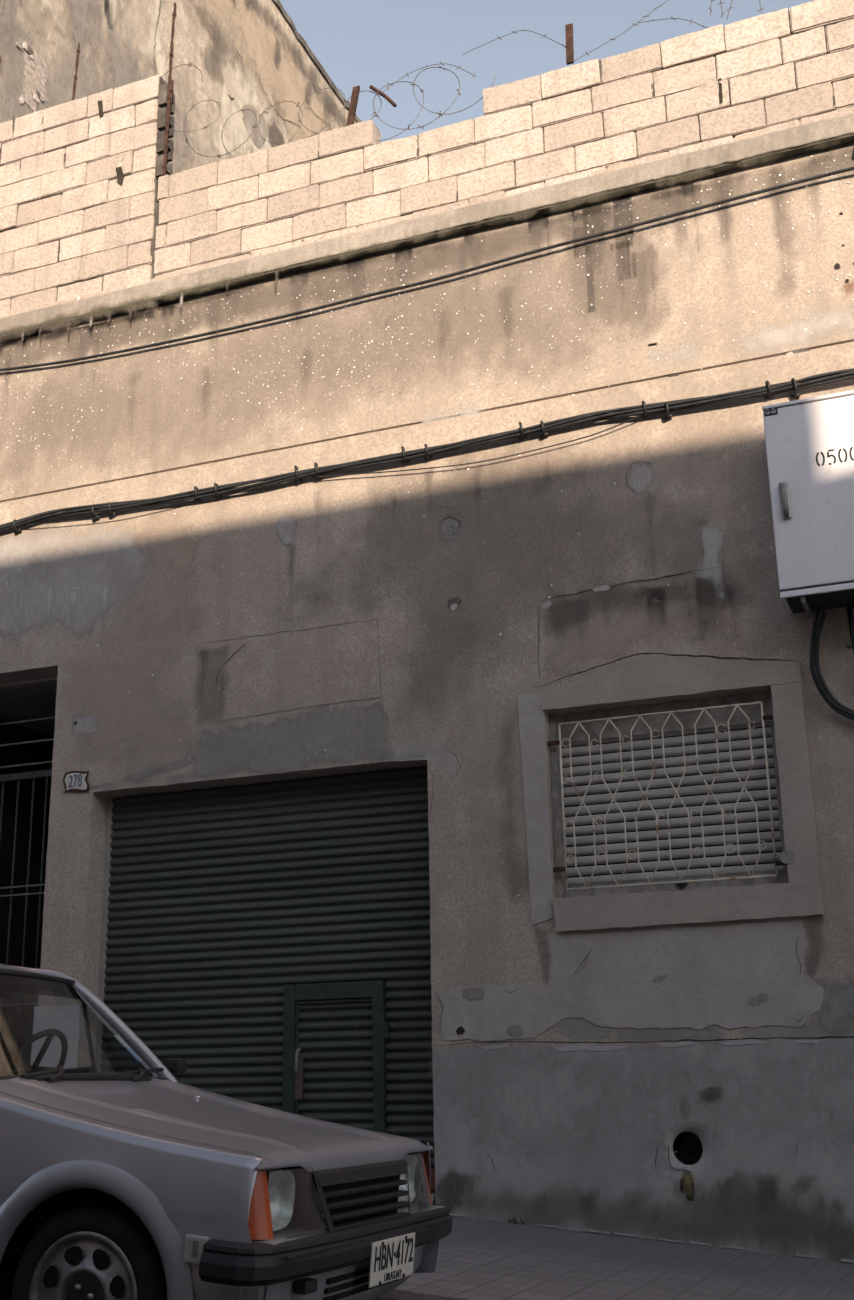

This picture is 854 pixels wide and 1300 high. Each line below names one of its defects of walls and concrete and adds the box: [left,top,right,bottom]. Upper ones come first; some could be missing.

crack [154,0,195,71]
flaking render [15,42,48,113]
spalling [72,43,80,101]
spalling [553,1043,629,1052]
crack [441,1036,854,1046]
damp [438,1172,463,1211]